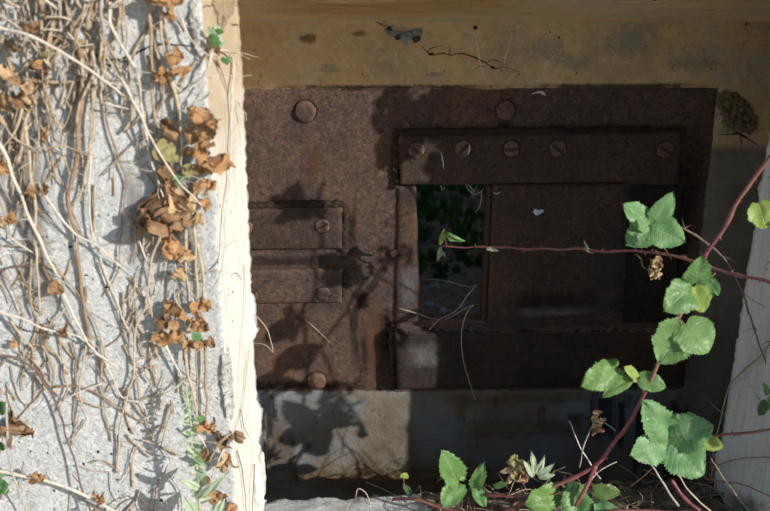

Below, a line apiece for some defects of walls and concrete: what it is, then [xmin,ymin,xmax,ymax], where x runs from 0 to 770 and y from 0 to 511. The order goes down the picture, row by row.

spalling [384,26,423,45]
crack [422,46,519,72]
spalling [715,89,759,135]
rust [674,147,703,279]
rust [252,257,314,266]
rust [351,278,382,367]
rust [257,371,357,390]
water stain [262,414,274,438]